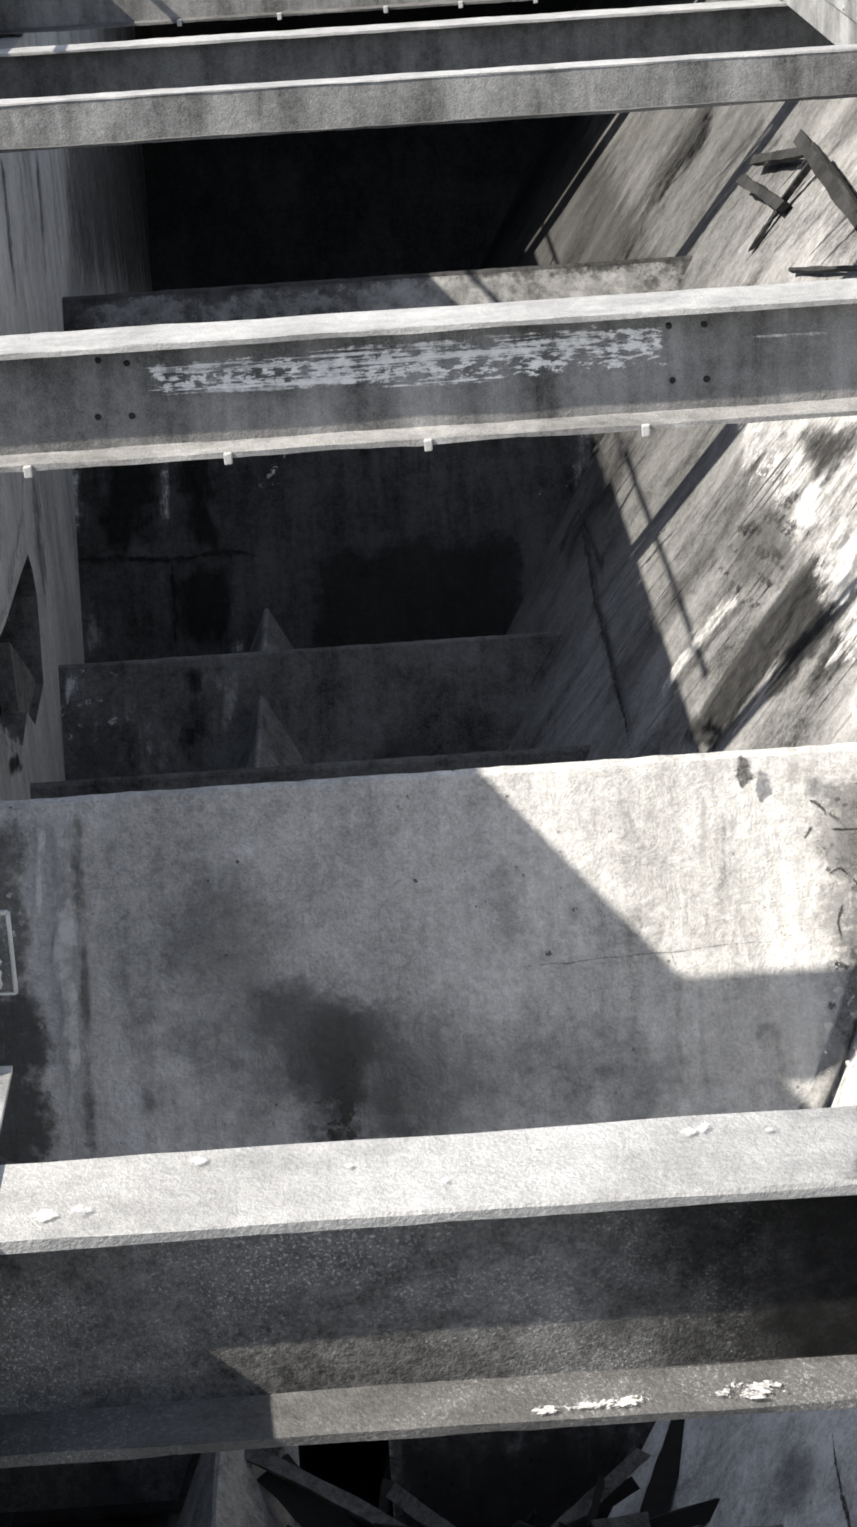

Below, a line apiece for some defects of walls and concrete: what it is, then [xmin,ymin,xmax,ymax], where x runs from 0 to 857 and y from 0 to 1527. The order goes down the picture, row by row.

water stain [313,531,522,647]
crack [531,513,673,746]
water stain [664,421,857,747]
water stain [0,820,94,1165]
water stain [261,978,416,1142]
crack [832,1435,851,1527]